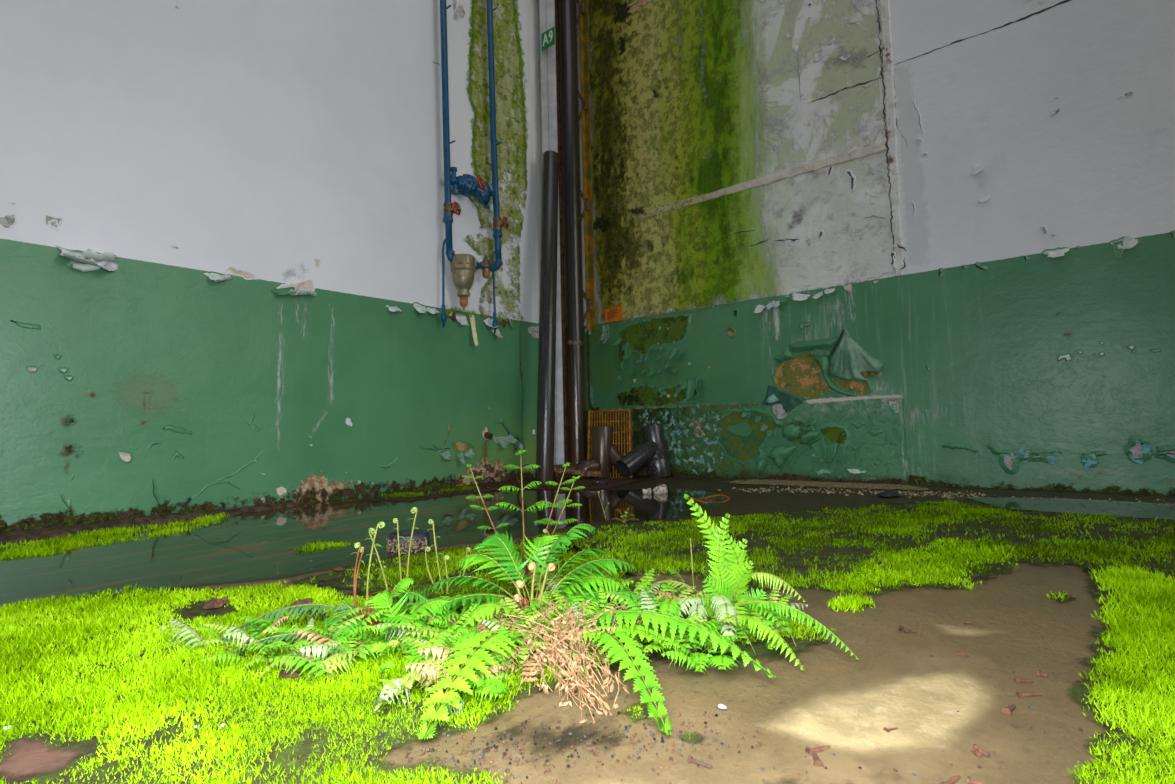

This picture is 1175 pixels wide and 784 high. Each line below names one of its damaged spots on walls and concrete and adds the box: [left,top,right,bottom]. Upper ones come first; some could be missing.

mould [614,2,630,22]
crack [797,0,1071,270]
peeling [43,213,119,272]
peeling [1108,233,1139,258]
spalling [200,265,258,282]
peeling [271,258,321,297]
crack [939,262,988,277]
peeling [585,309,903,481]
peeling [432,418,536,465]
peeling [942,442,1062,475]
peeling [1123,434,1175,464]
peeling [0,485,499,607]